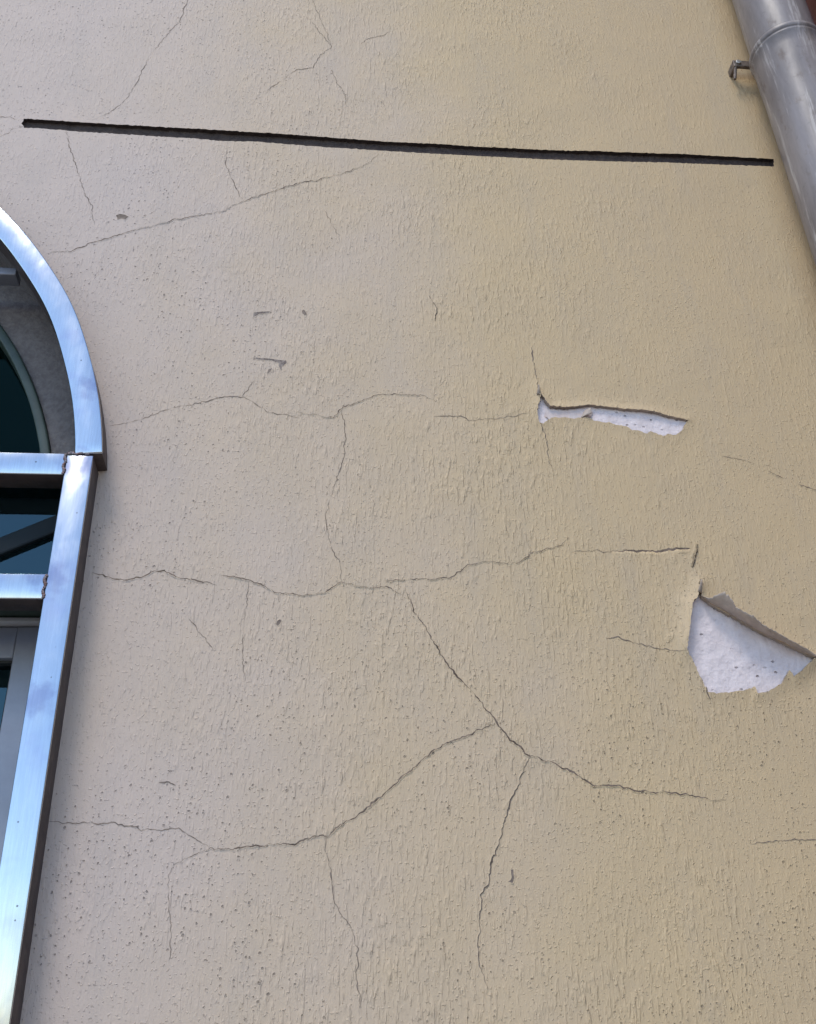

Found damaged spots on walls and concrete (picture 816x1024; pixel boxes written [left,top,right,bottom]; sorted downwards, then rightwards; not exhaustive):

crack [50,140,379,253]
peeling [536,384,687,436]
crack [724,456,816,491]
crack [49,347,726,1004]
peeling [687,574,816,700]